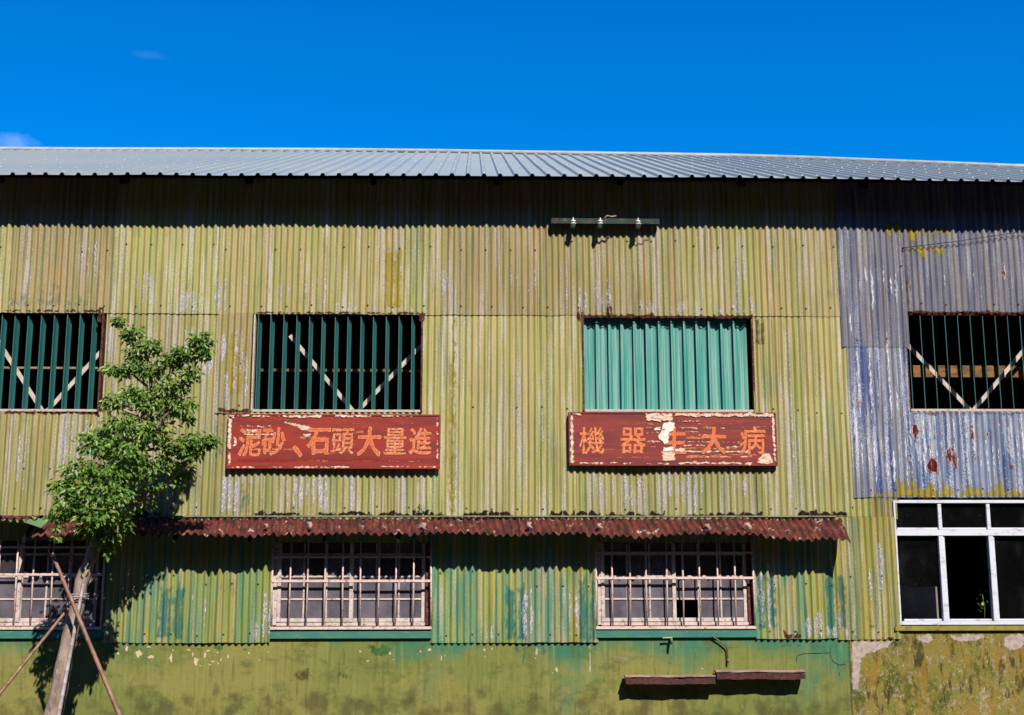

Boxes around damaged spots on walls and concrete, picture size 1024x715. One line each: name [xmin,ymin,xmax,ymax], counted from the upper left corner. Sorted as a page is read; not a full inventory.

rust [0,504,851,543]
spalling [917,634,933,643]
spalling [950,633,984,642]
spalling [1004,633,1024,650]